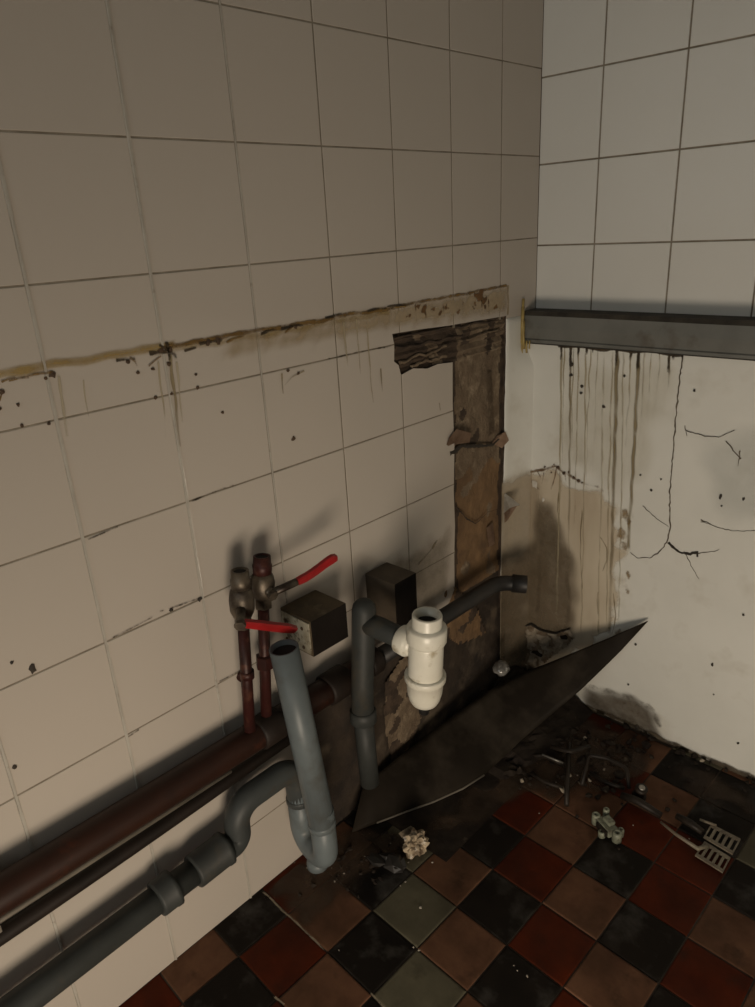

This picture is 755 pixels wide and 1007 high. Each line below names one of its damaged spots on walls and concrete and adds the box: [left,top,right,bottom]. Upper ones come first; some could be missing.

spalling [374,316,631,773]
crack [630,361,741,579]
spalling [314,695,362,825]
leakage [586,684,659,734]